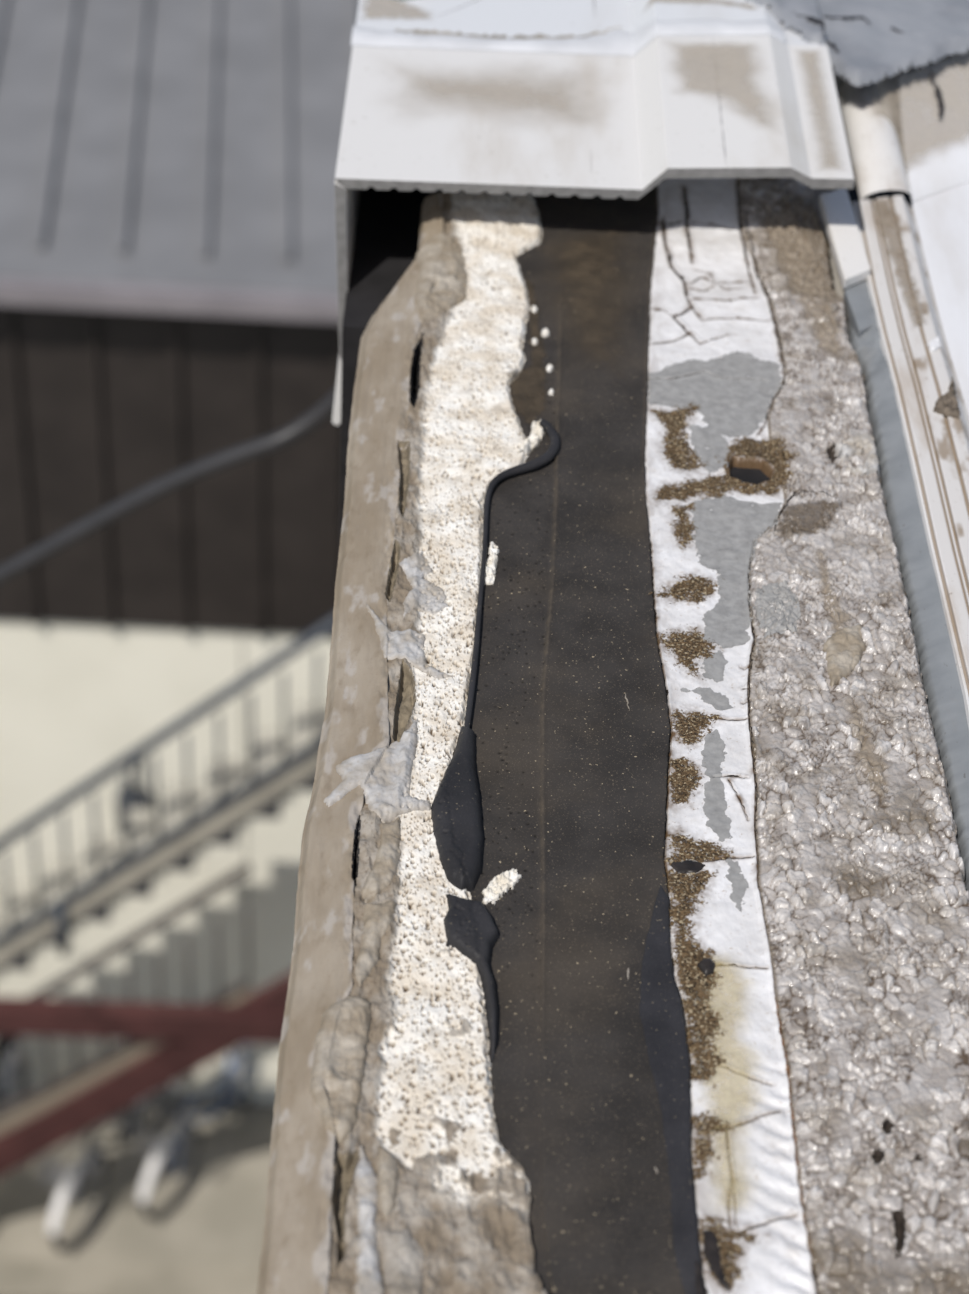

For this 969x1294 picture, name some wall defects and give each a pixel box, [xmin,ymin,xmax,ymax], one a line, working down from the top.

leakage [682,46,759,113]
crack [648,187,786,433]
peeling [680,494,801,710]
peeling [701,729,733,842]
peeling [725,859,749,912]
crack [811,1262,819,1294]